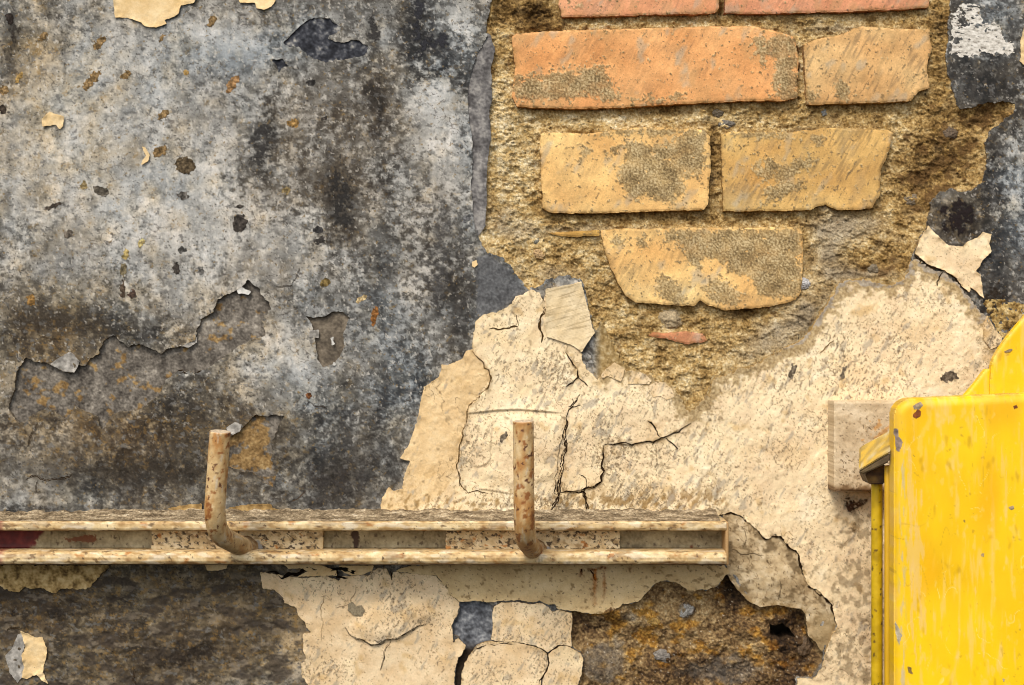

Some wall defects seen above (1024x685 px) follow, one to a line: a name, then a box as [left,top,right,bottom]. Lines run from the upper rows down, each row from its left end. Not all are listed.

peeling [10,280,271,429]
crack [456,351,492,493]
crack [490,297,546,343]
crack [551,352,689,510]
spalling [260,0,1024,685]
peeling [5,631,48,684]
crack [474,641,564,683]